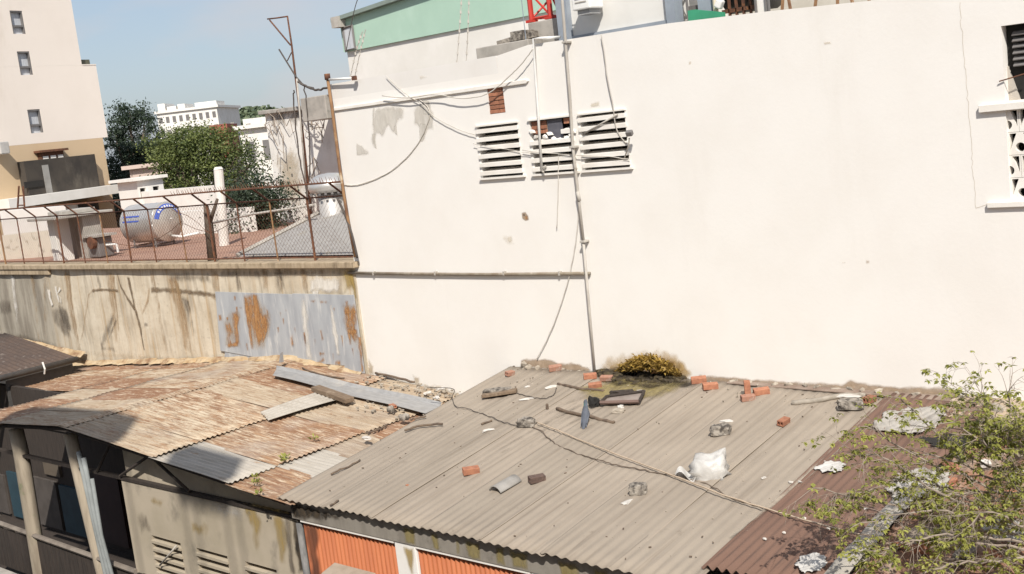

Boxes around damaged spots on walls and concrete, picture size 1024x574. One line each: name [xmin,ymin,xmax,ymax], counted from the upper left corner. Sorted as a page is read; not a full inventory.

peeling [357,108,402,155]
peeling [415,101,433,141]
crack [960,11,987,208]
damp [169,279,188,331]
corrosion [219,295,284,350]
corrosion [342,307,363,371]